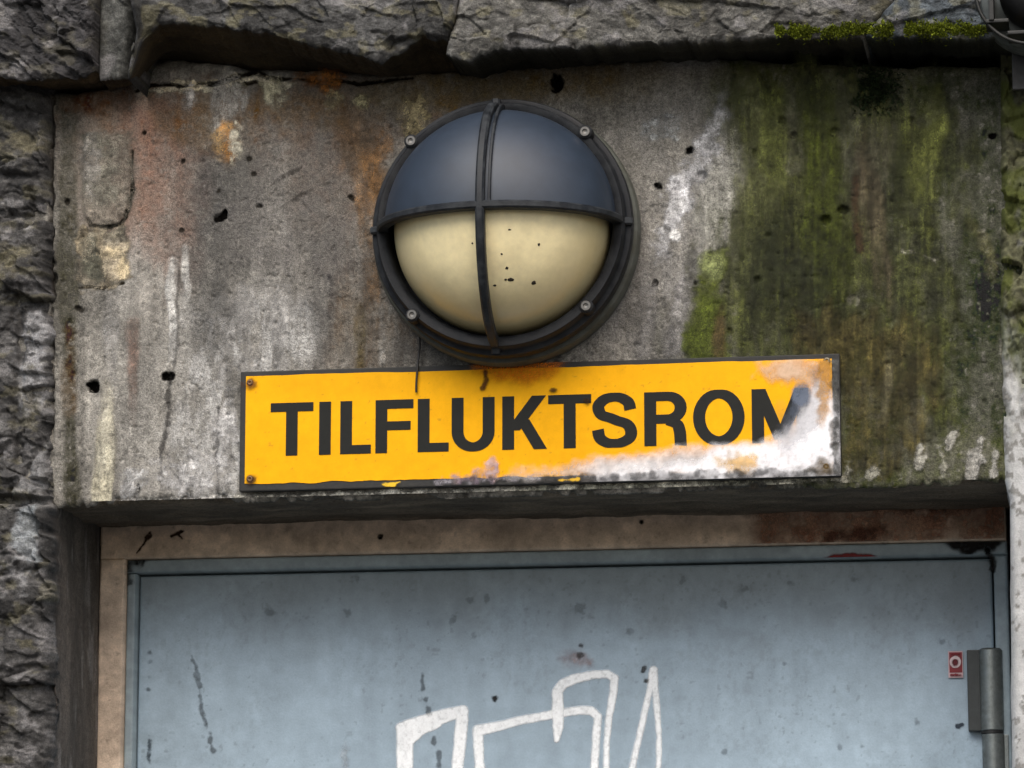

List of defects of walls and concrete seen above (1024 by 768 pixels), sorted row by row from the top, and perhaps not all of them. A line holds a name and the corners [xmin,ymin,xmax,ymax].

rust [216,122,242,162]
leakage [658,109,790,358]
leakage [750,116,891,341]
rust [753,507,1005,544]